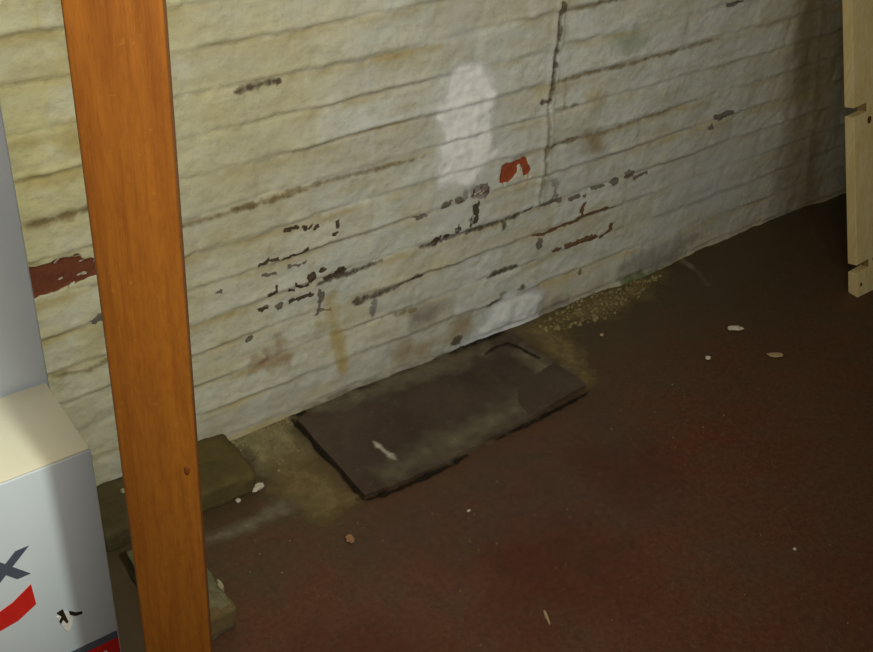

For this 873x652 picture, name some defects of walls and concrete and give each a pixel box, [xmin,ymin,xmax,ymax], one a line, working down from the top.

leakage [434,61,499,191]
peeling [500,156,532,187]
spalling [540,169,648,207]
spalling [283,224,319,233]
peeling [430,183,490,244]
spalling [536,222,614,252]
peeling [29,254,96,298]
spalling [257,247,347,316]